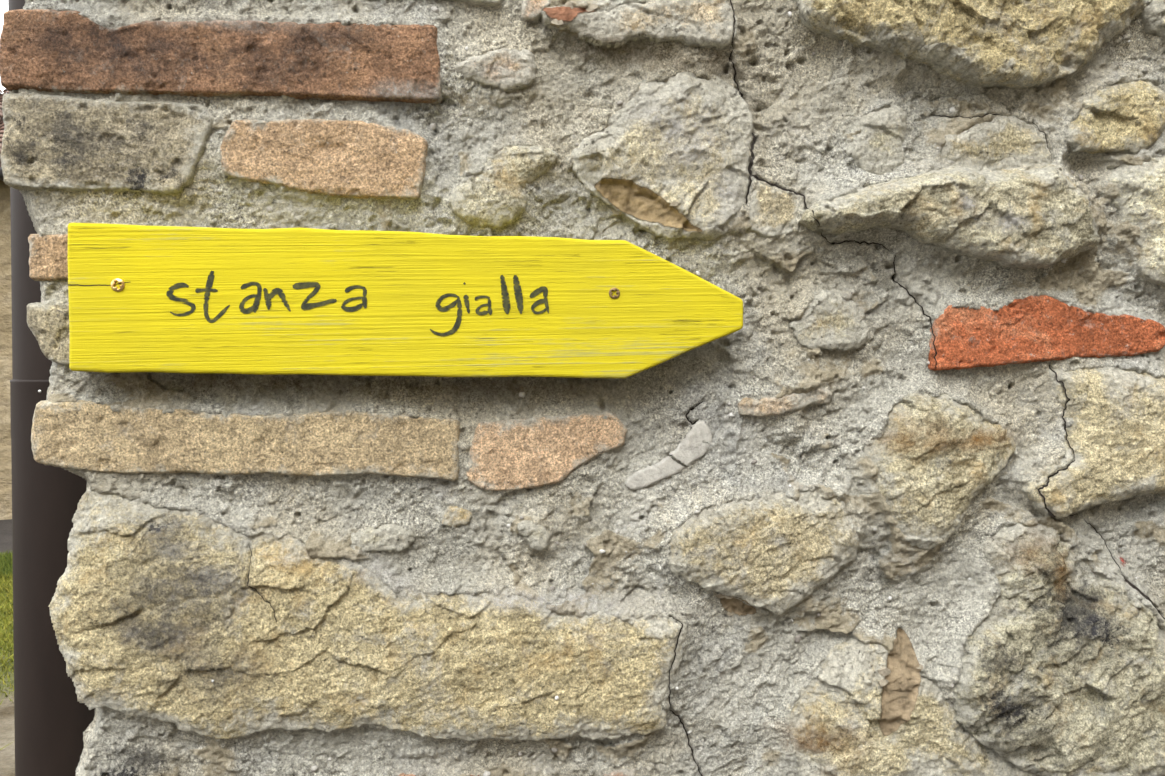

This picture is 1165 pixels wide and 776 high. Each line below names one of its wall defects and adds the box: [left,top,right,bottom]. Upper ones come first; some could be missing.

crack [729,0,743,97]
crack [746,132,937,365]
crack [1037,365,1165,620]
crack [668,616,703,776]